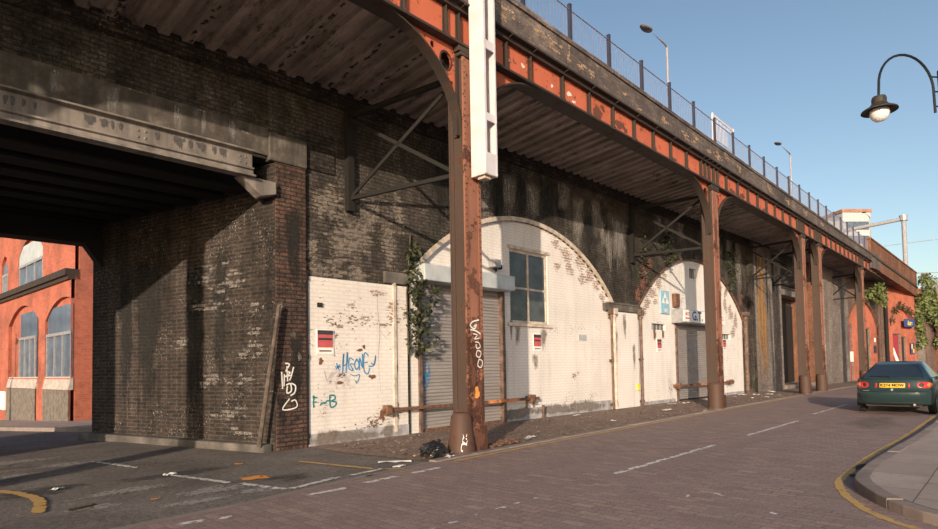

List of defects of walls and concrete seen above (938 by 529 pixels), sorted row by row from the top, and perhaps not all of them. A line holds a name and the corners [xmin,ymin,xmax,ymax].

spalling [533,26,599,79]
spalling [681,130,742,173]
damp [437,153,449,213]
damp [286,211,300,272]
corrosion [468,268,480,330]
damp [482,176,630,265]
peeling [551,240,605,303]
spalling [635,258,667,312]